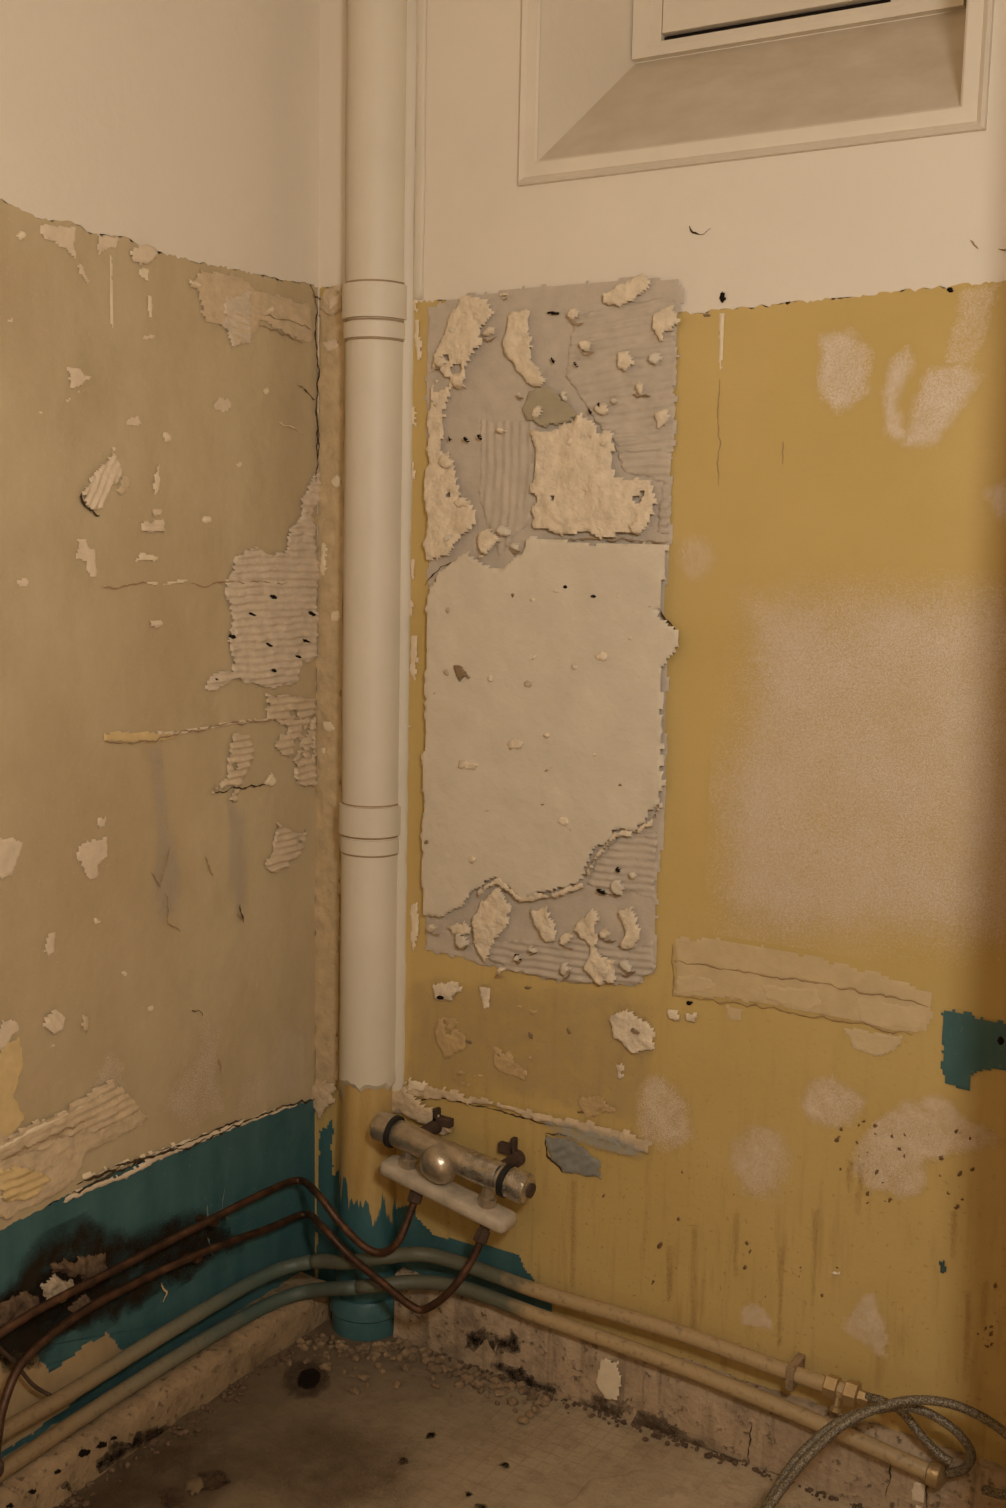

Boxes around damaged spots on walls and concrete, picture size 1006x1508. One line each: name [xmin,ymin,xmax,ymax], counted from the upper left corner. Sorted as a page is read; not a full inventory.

peeling [80,447,132,517]
spalling [141,463,165,533]
spalling [135,553,158,562]
spalling [407,273,684,1009]
peeling [43,1009,89,1047]
peeling [856,997,1006,1091]
spalling [0,1019,149,1220]
peeling [0,1332,122,1452]
leakage [465,1327,750,1465]
spalling [78,1436,117,1458]